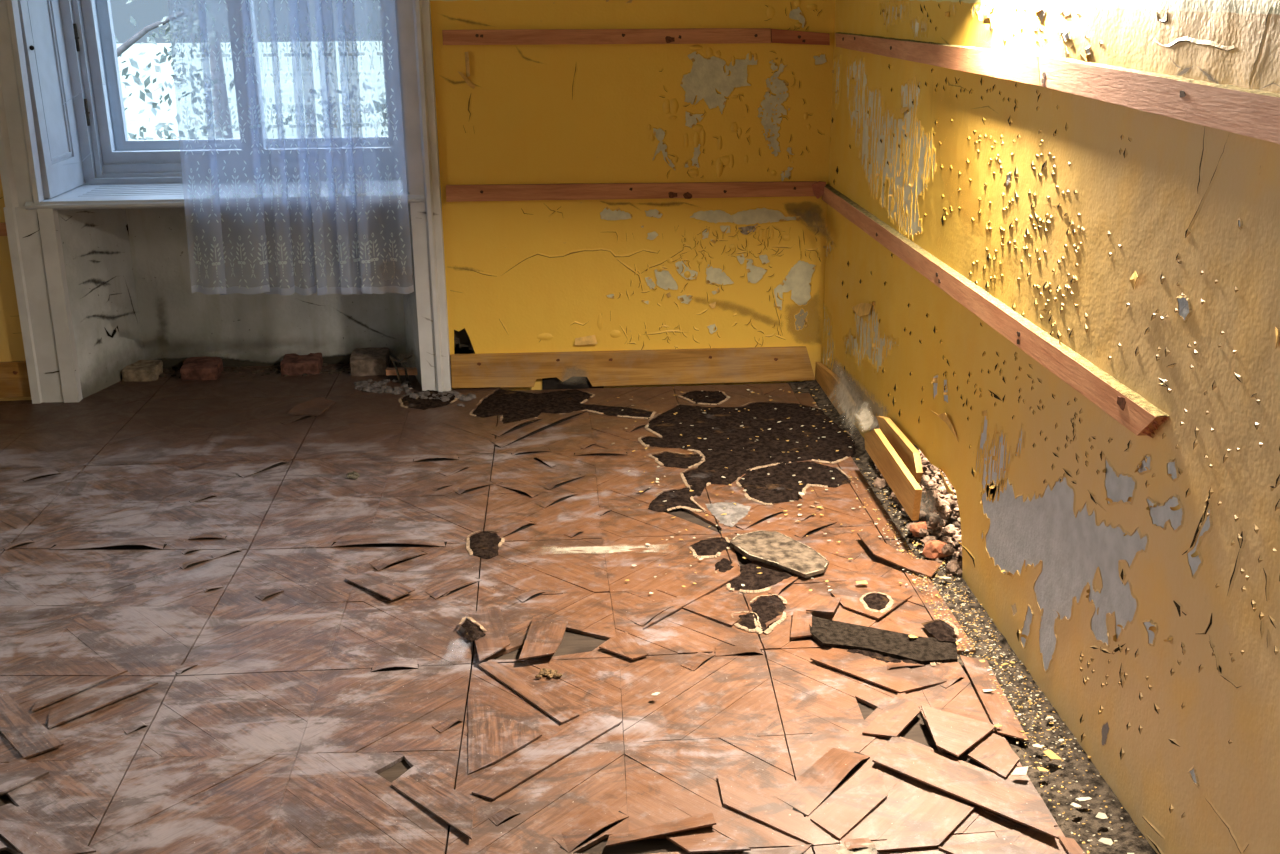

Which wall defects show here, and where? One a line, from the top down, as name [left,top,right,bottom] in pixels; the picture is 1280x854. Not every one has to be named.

peeling [651,127,701,171]
peeling [679,50,795,182]
peeling [846,56,937,241]
peeling [599,206,663,241]
crack [464,224,823,350]
peeling [689,207,801,244]
peeling [642,239,899,376]
peeling [931,373,949,405]
peeling [975,410,1185,673]
peeling [1187,498,1213,579]